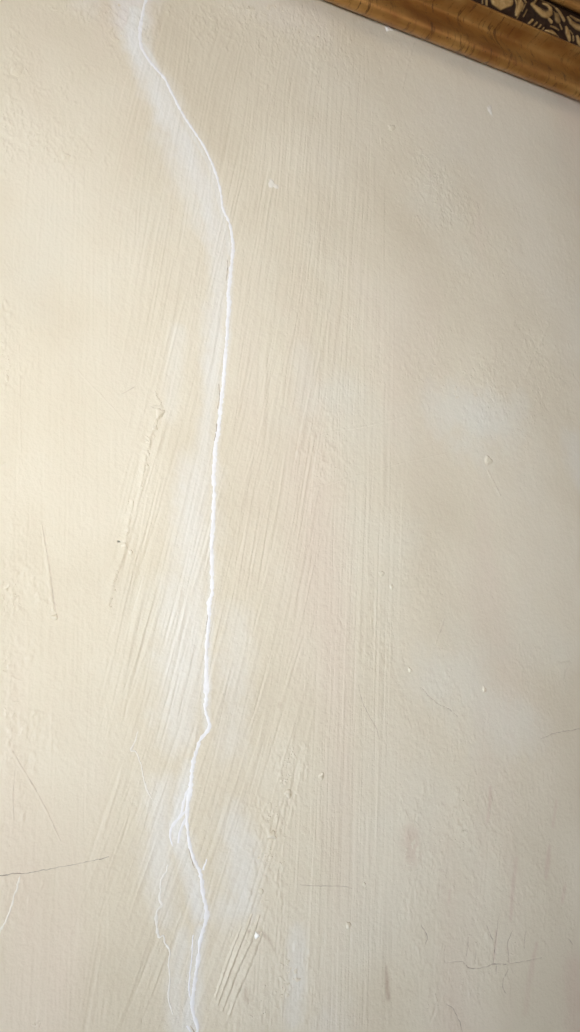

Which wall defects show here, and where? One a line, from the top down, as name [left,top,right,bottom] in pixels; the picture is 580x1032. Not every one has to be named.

crack [138,0,235,1032]